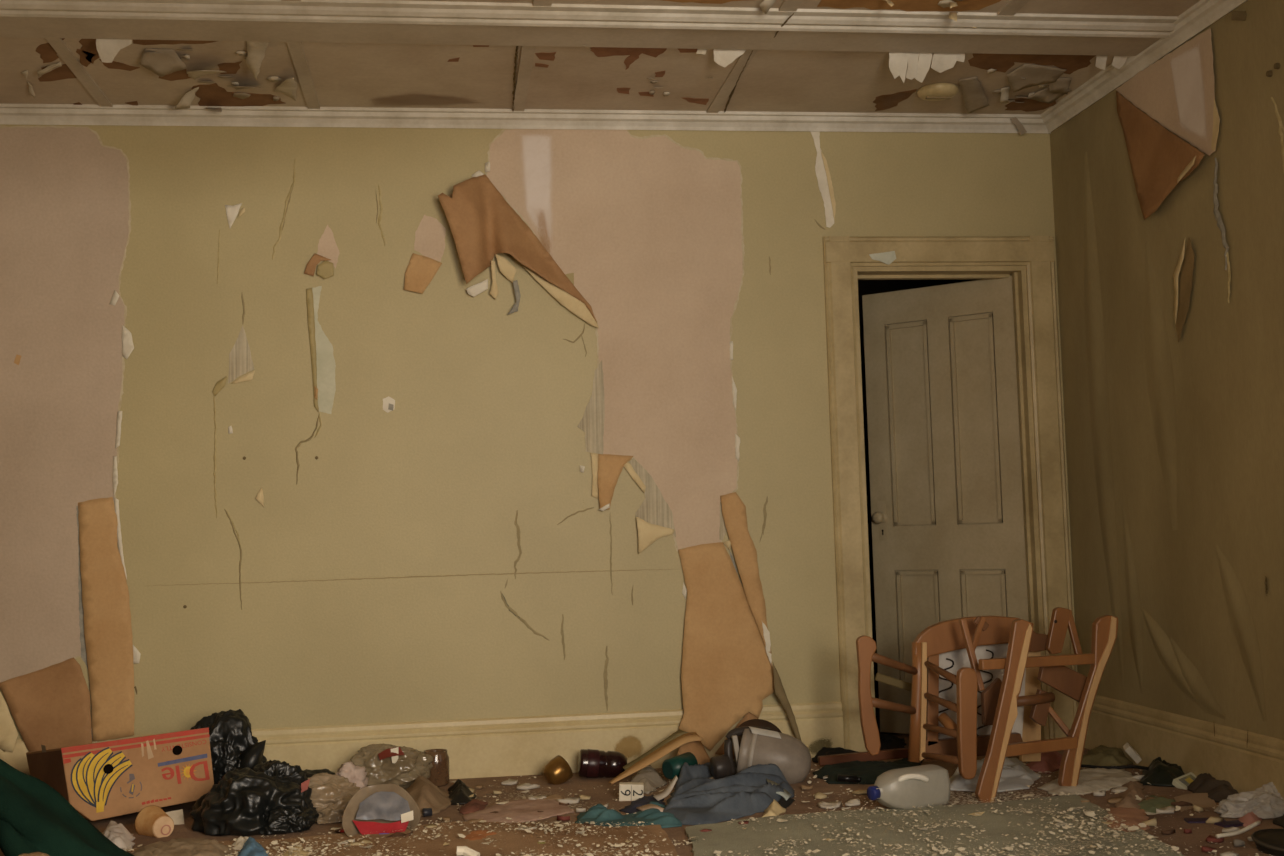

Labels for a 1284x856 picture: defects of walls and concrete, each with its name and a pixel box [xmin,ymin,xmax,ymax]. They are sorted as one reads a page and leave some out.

peeling [663,0,776,14]
peeling [817,0,1001,21]
peeling [21,38,297,113]
peeling [873,28,1220,183]
peeling [810,131,836,230]
peeling [304,225,340,279]
peeling [404,215,446,294]
peeling [1173,237,1186,325]
flaking render [466,129,743,553]
flaking render [0,127,134,682]
crack [153,507,671,660]